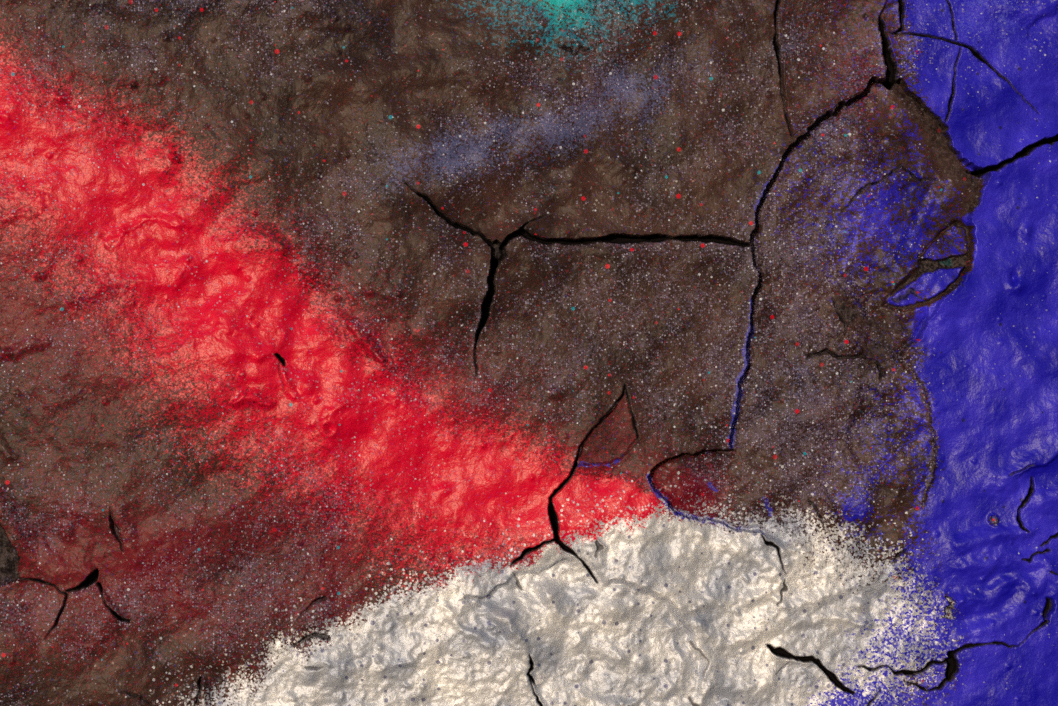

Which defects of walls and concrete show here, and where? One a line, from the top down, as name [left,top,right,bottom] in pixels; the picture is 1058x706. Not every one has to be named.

crack [772,0,794,138]
crack [876,0,1058,179]
crack [401,177,751,378]
spalling [0,525,20,589]
crack [509,381,641,585]
crack [1007,463,1058,577]
crack [766,617,1050,706]